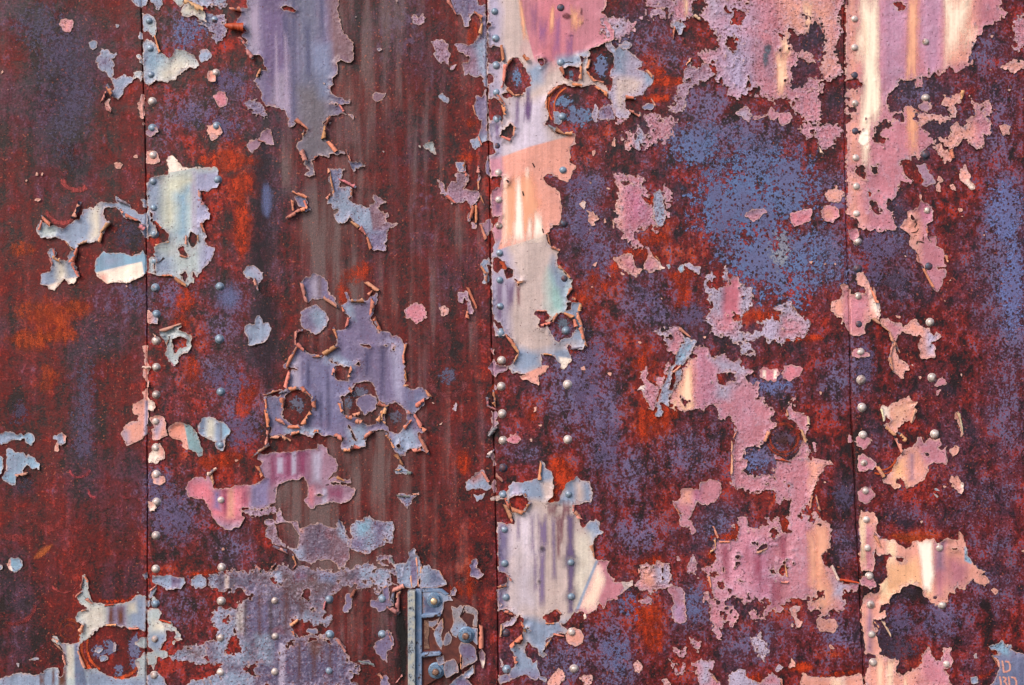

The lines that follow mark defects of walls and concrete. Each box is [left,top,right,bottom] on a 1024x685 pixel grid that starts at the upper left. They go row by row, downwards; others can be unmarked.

peeling [89,0,398,251]
peeling [36,151,219,291]
rust [201,150,259,253]
rust [571,232,671,305]
peeling [431,0,1024,437]
peeling [0,273,485,685]
rust [548,458,574,503]
rust [638,405,677,438]
rust [710,523,738,541]
peeling [466,172,998,685]
rust [77,632,142,679]
rust [790,662,859,677]